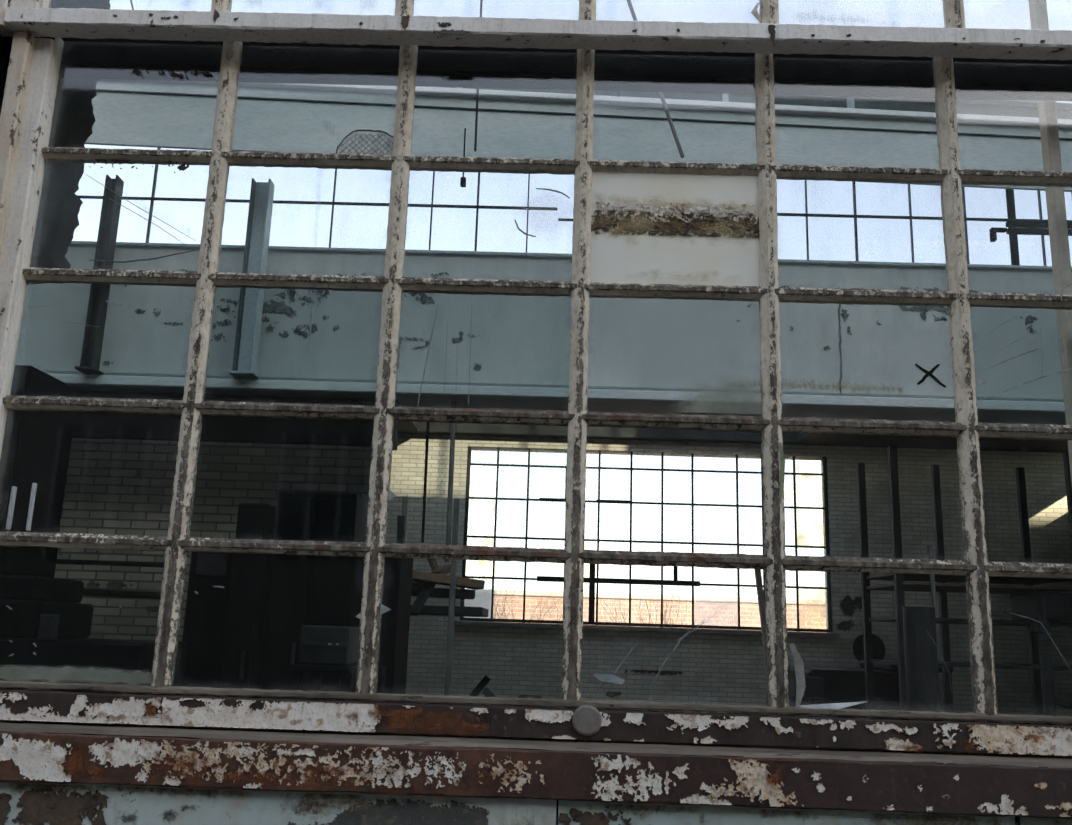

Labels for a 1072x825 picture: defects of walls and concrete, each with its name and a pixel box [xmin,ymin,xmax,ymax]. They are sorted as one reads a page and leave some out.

peeling [596,201,759,224]
peeling [261,289,339,339]
peeling [0,692,381,732]
peeling [504,709,576,739]
peeling [599,712,646,740]
peeling [665,643,922,751]
peeling [0,733,109,825]
corrosion [165,756,364,784]
peeling [88,738,490,825]
peeling [478,753,544,793]
peeling [556,754,804,825]
peeling [791,768,825,793]